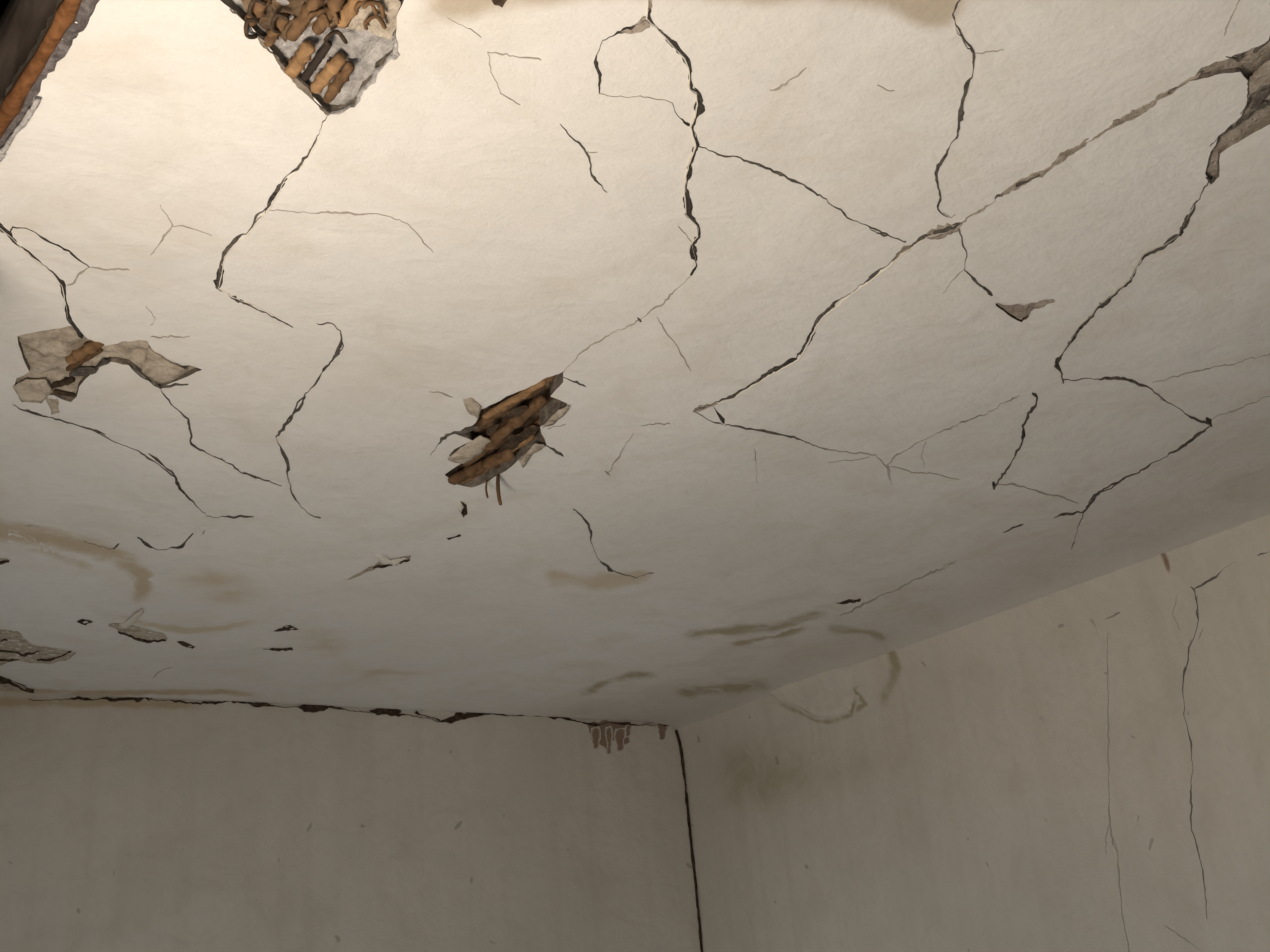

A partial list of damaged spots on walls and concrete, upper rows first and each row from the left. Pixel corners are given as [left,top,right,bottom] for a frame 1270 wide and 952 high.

flaking render [230,0,401,115]
damp [405,0,974,46]
flaking render [1197,37,1270,184]
flaking render [13,326,196,415]
crack [13,404,254,550]
crack [0,115,433,519]
flaking render [429,375,586,505]
crack [560,0,1270,550]
damp [0,514,290,636]
crack [29,667,703,952]
corrosion [587,720,632,755]
damp [675,605,914,842]